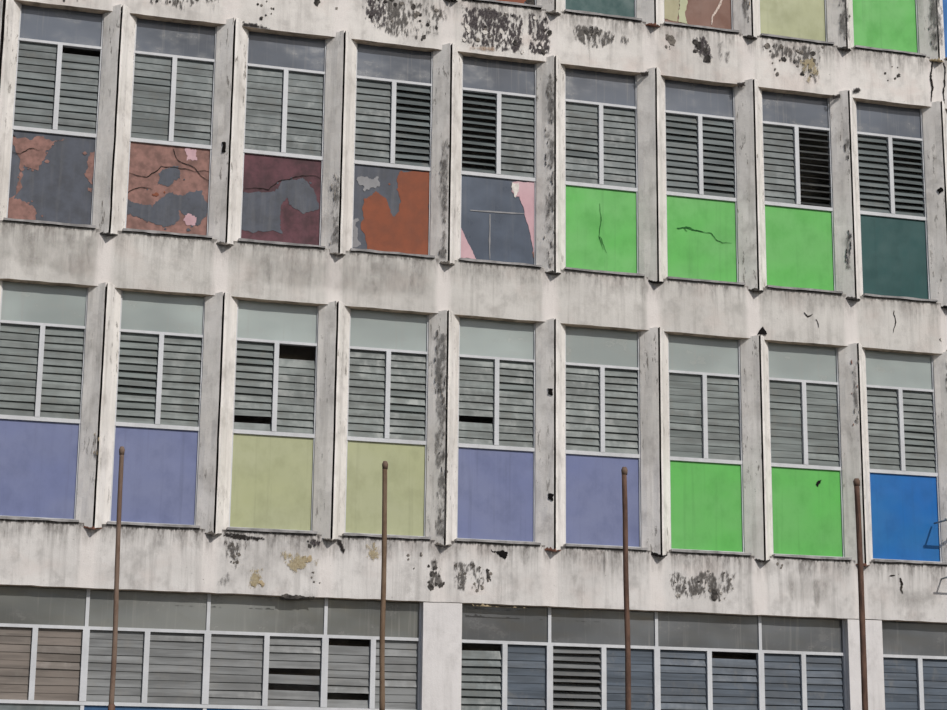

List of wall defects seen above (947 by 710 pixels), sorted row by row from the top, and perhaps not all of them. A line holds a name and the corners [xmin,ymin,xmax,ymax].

mould [363,0,446,41]
leakage [462,7,552,55]
mould [573,25,629,48]
mould [692,36,729,63]
peeling [743,35,825,82]
peeling [837,0,852,51]
peeling [8,134,64,220]
peeling [83,151,95,193]
peeling [127,147,210,231]
crack [677,226,728,243]